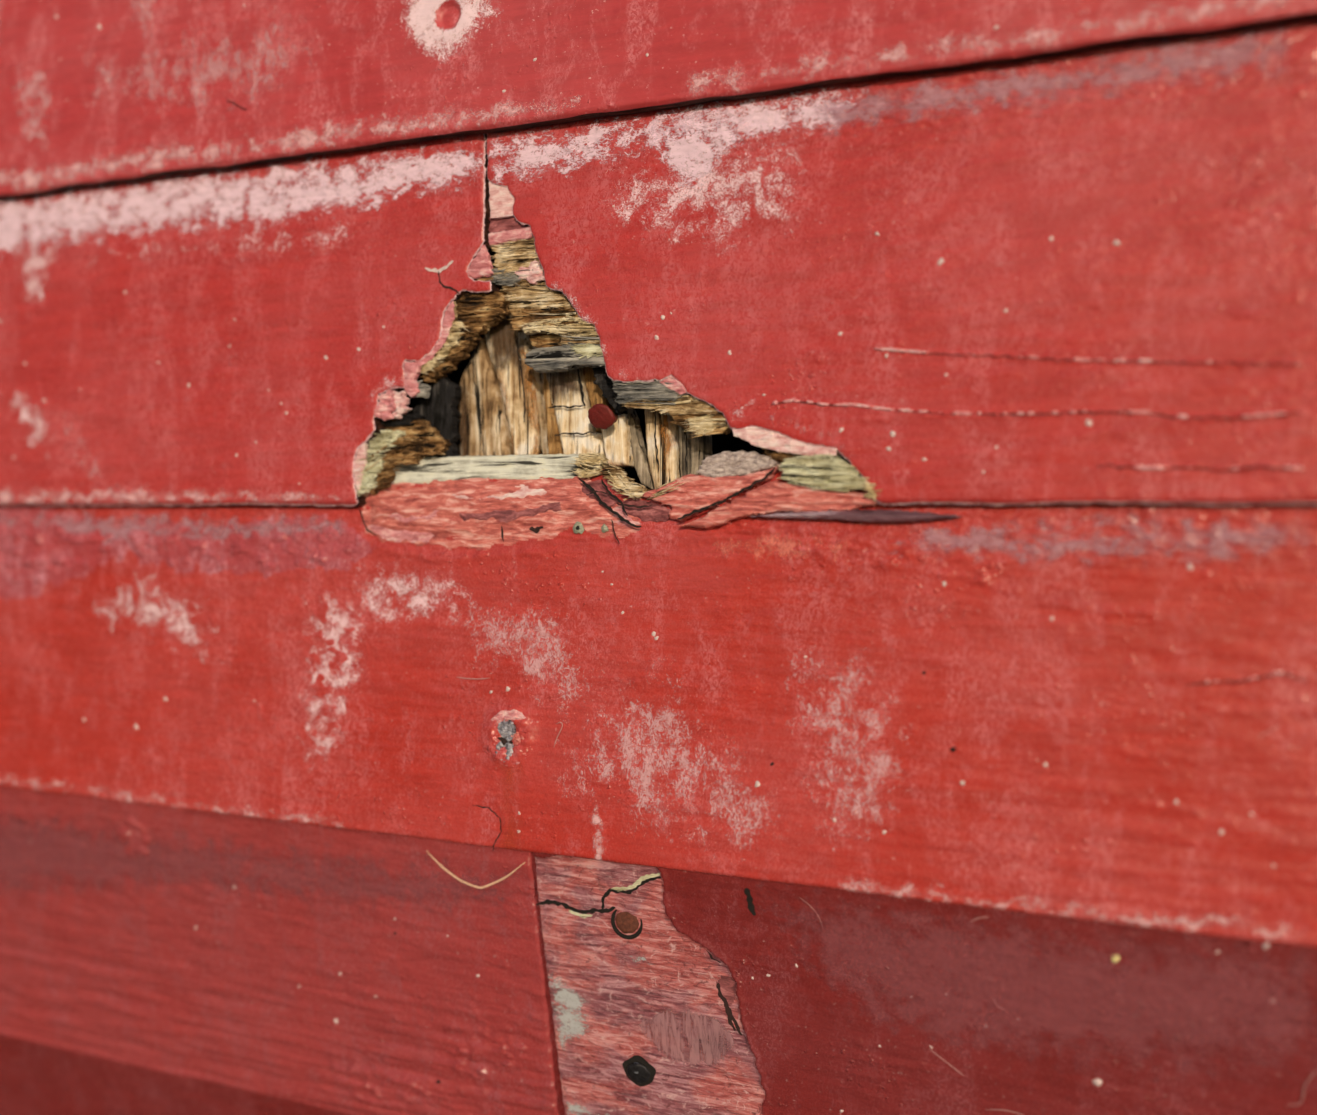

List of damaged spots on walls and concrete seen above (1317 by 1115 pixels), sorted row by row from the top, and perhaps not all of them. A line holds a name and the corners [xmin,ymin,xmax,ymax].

peeling [466,181,533,279]
peeling [515,260,545,285]
peeling [373,301,458,421]
crack [873,348,1304,365]
peeling [660,376,686,395]
crack [771,398,1304,420]
peeling [726,421,838,456]
crack [1096,464,1304,472]
peeling [352,443,671,551]
peeling [535,855,765,1115]